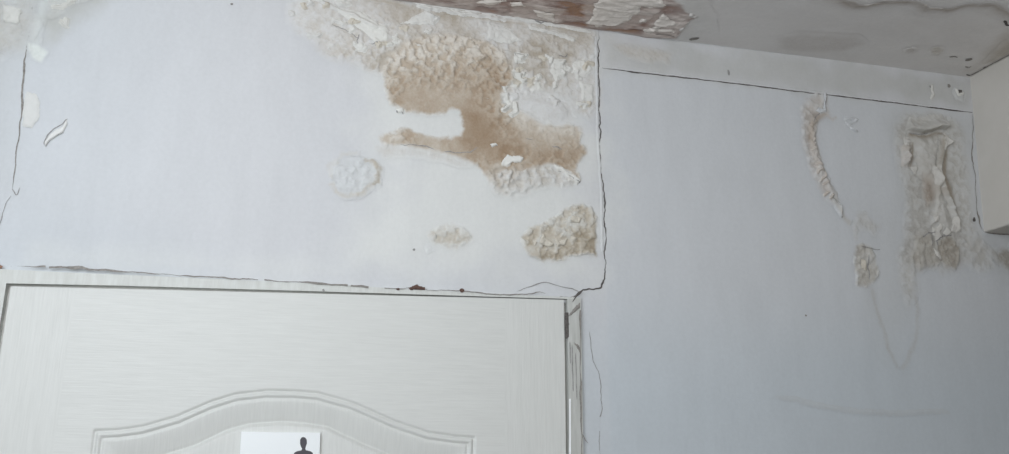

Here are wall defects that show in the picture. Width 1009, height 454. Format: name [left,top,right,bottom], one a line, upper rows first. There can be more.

crack [0,0,50,223]
leakage [373,32,589,202]
flaking render [282,0,720,122]
peeling [797,90,852,227]
crack [23,265,369,292]
leakage [413,220,475,254]
leakage [518,202,599,265]
crack [385,32,1009,454]